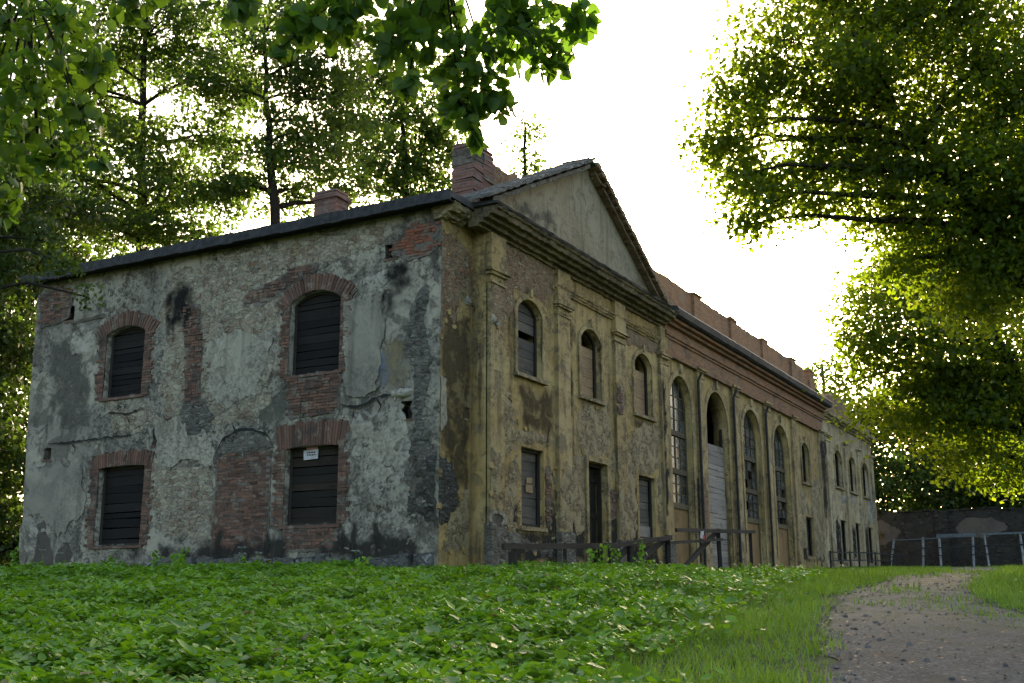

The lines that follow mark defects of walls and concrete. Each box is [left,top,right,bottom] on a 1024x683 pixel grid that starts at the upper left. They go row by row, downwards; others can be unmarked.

flaking render [38,285,105,356]
crack [47,408,141,452]
flaking render [107,220,471,558]
crack [340,394,391,418]
damp [519,385,553,447]